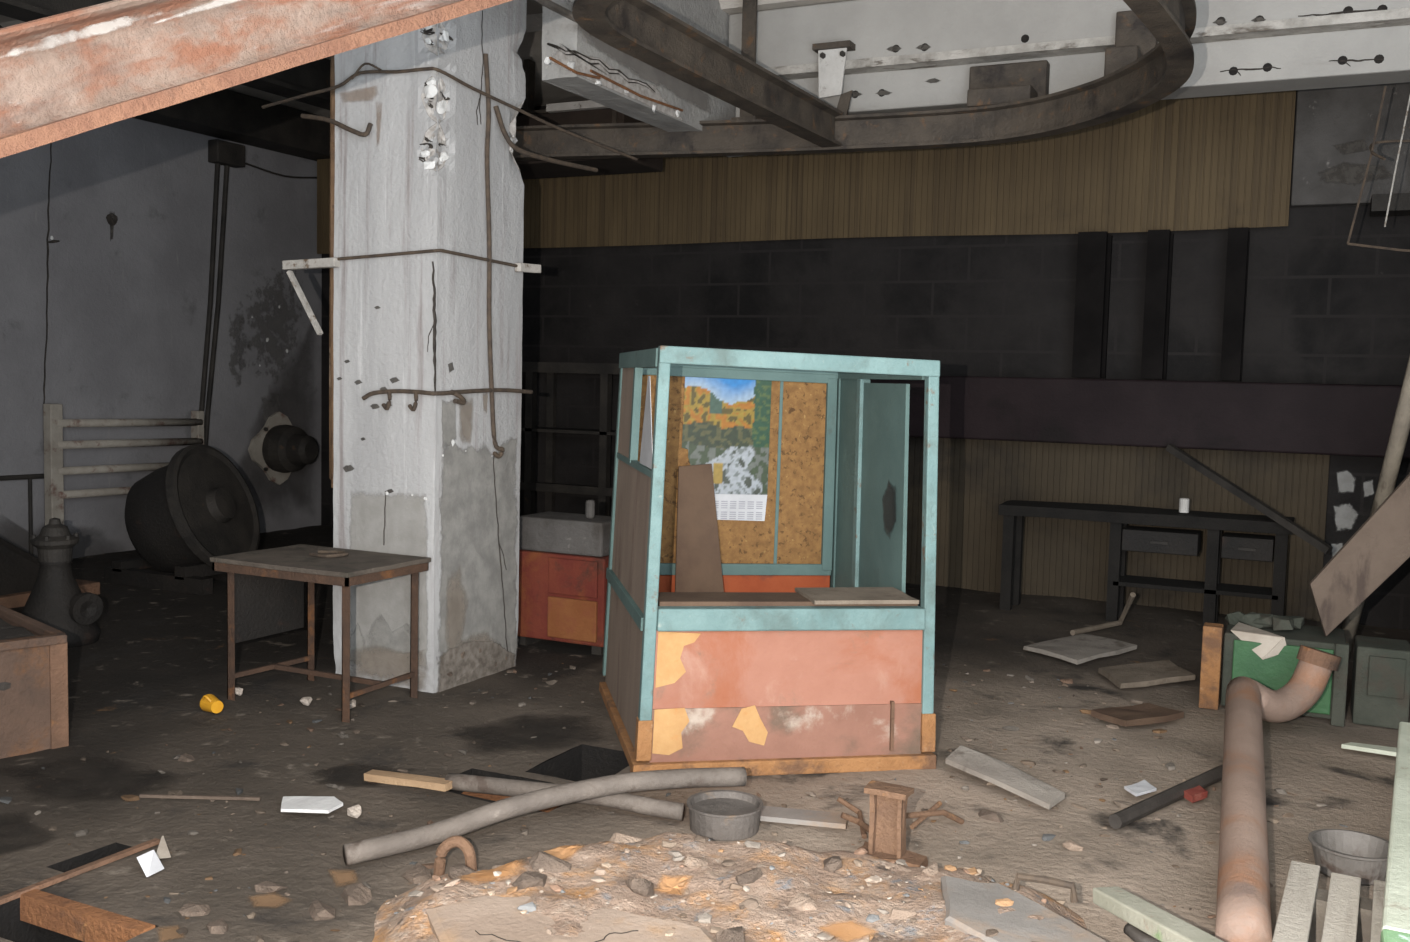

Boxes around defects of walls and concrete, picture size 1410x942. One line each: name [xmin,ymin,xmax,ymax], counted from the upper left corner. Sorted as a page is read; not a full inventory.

spalling [419,22,453,171]
leakage [257,342,309,434]
leakage [242,454,307,501]